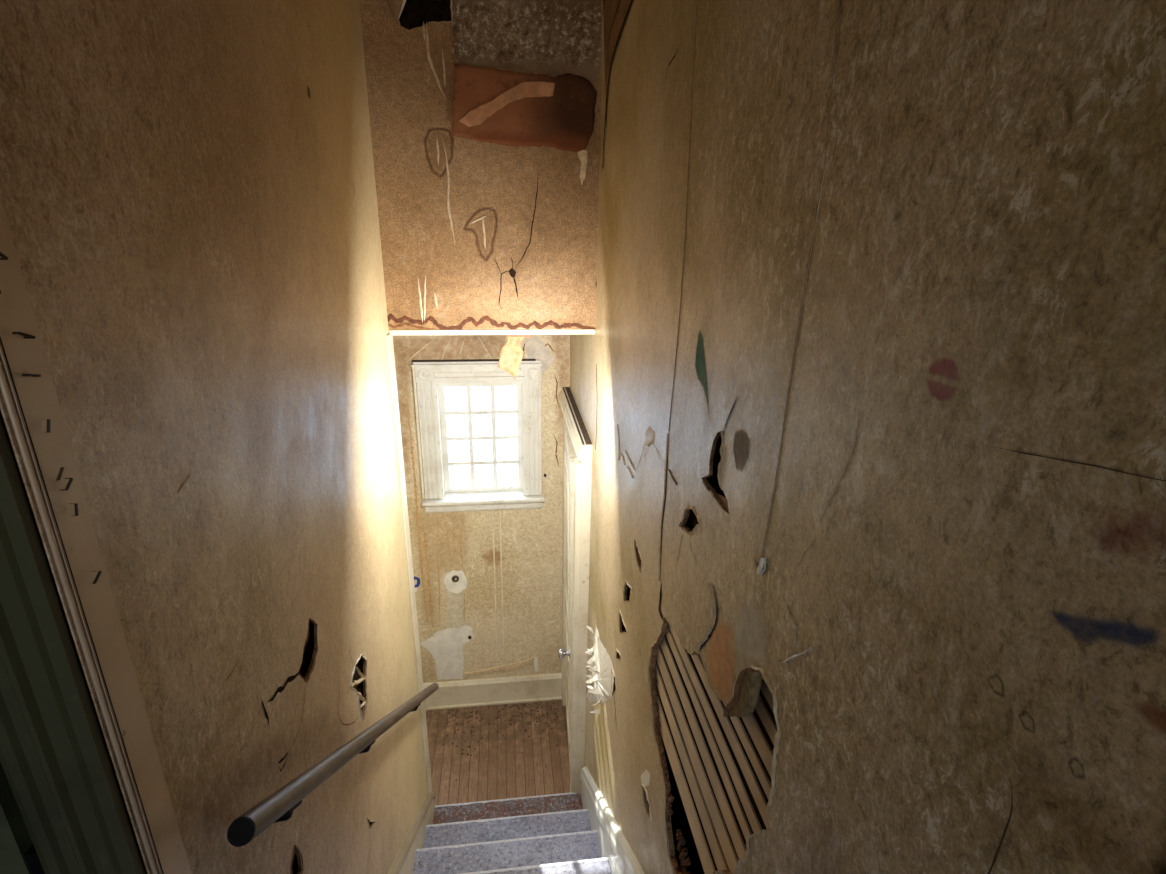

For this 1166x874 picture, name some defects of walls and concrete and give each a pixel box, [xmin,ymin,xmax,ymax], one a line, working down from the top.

flaking render [399,0,602,89]
crack [494,179,538,312]
spalling [700,394,739,514]
crack [992,446,1166,482]
spalling [677,502,702,562]
flaking render [444,570,467,594]
spalling [619,579,632,635]
spalling [261,618,318,772]
spalling [338,642,368,725]
peeling [585,626,621,731]
spalling [641,583,781,874]
crack [987,779,1013,874]